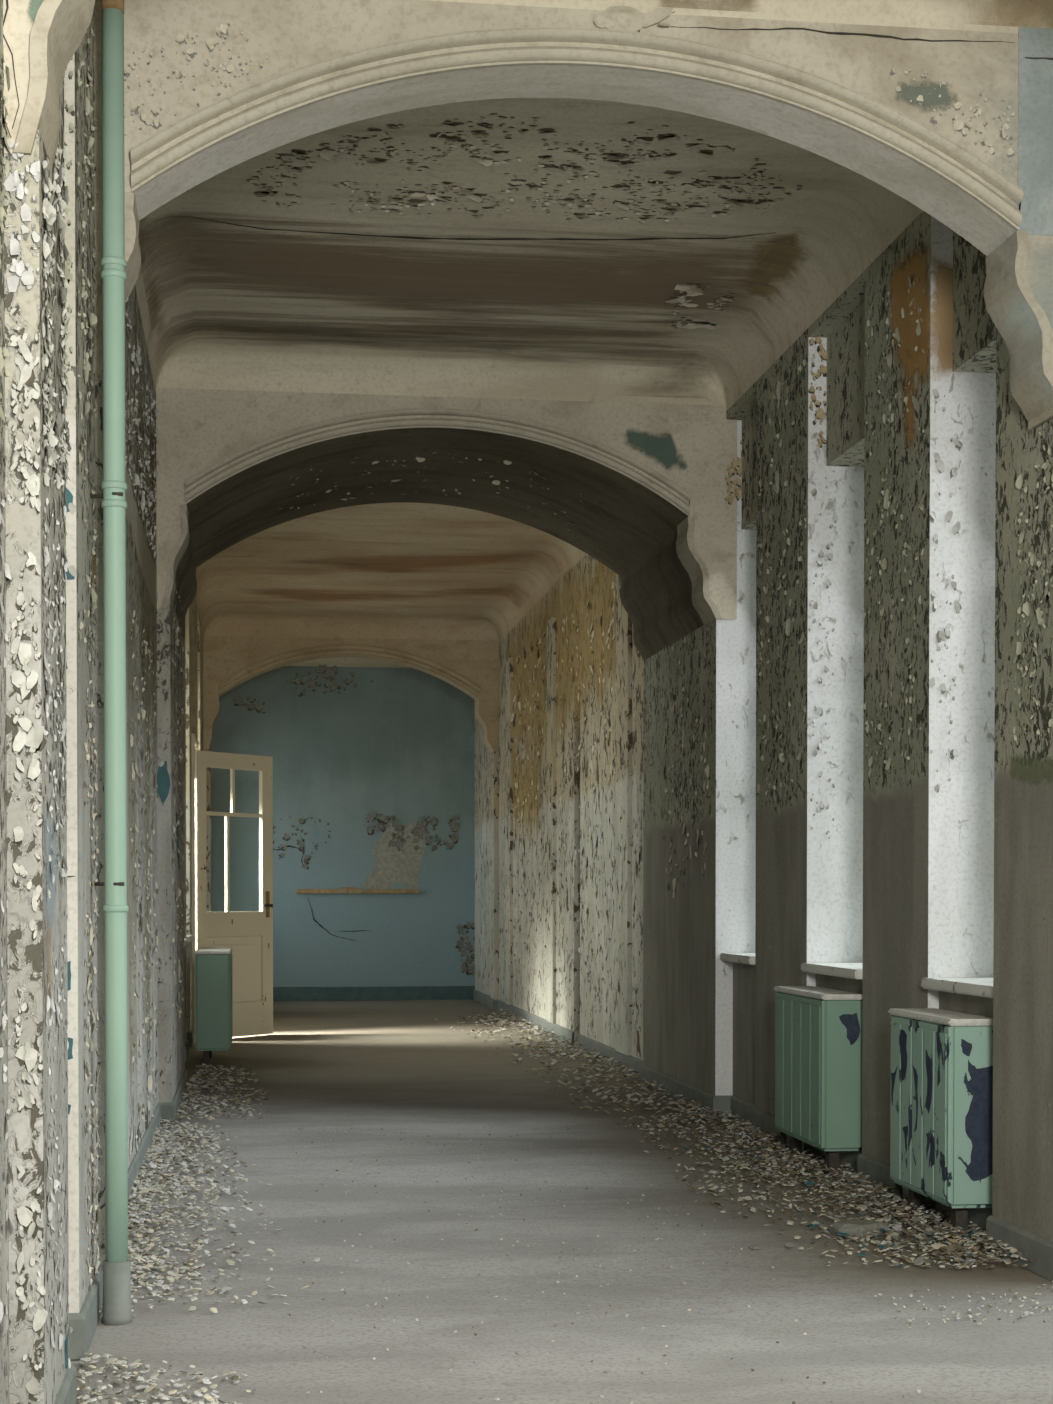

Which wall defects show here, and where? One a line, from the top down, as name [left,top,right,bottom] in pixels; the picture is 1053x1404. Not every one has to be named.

damp [998,0,1053,27]
spalling [245,113,805,224]
peeling [725,336,838,839]
peeling [863,272,963,793]
peeling [1013,422,1053,755]
peeling [273,816,331,869]
peeling [361,811,460,889]